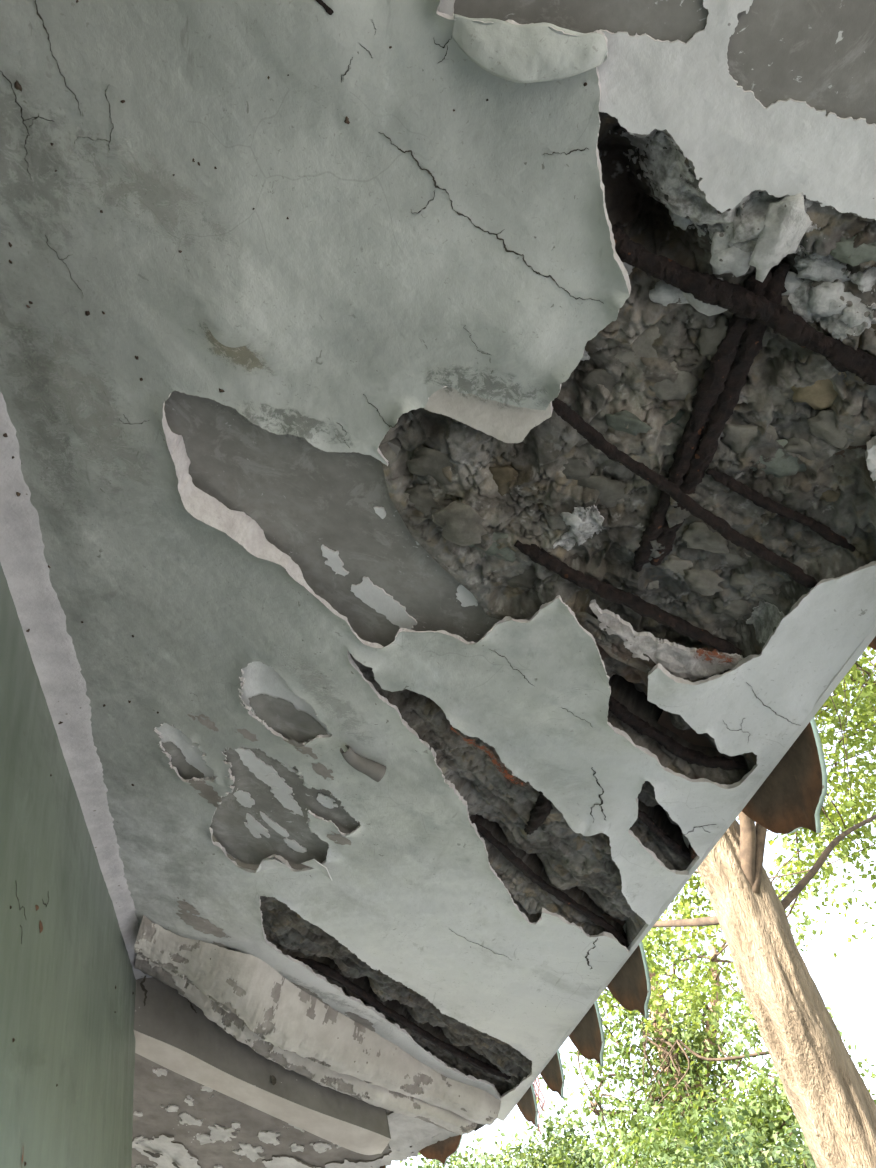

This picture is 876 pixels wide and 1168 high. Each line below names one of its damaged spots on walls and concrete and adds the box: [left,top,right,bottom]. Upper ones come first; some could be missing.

crack [2,73,53,180]
crack [35,0,114,150]
crack [316,0,334,15]
crack [378,132,603,303]
spalling [164,0,876,785]
peeling [156,661,360,881]
spalling [350,654,646,948]
crack [590,767,606,822]
spalling [630,781,697,871]
peeling [174,897,235,951]
spalling [260,896,532,1096]